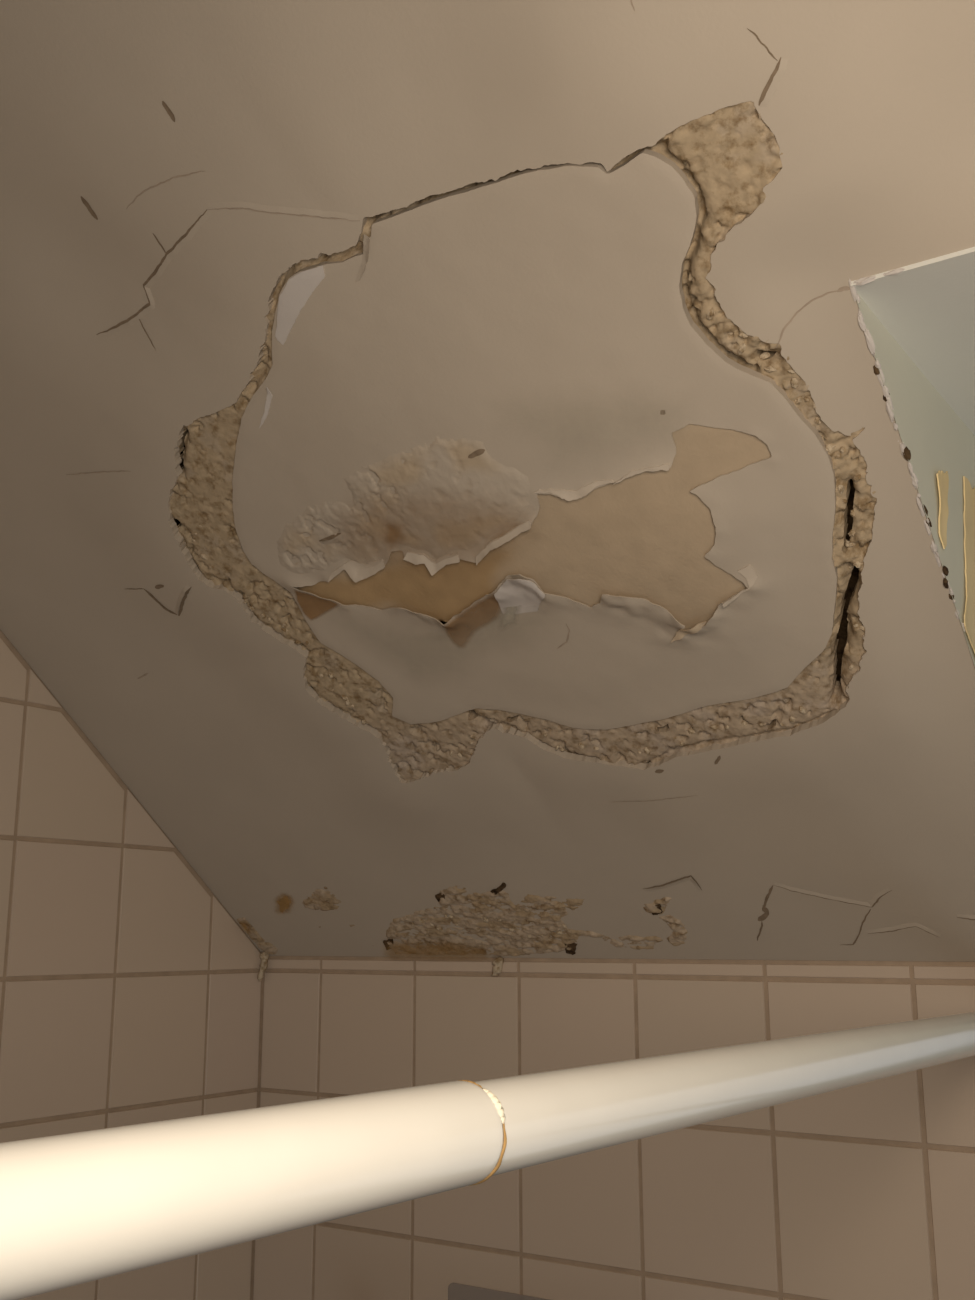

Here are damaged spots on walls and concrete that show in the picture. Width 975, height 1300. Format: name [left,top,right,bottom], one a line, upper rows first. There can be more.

crack [747,28,788,107]
crack [162,101,175,122]
crack [81,171,204,220]
crack [96,210,211,350]
flaking render [170,101,877,781]
spalling [848,268,966,632]
water stain [295,591,337,619]
water stain [446,596,499,647]
flaking render [383,883,688,976]
crack [757,883,975,945]